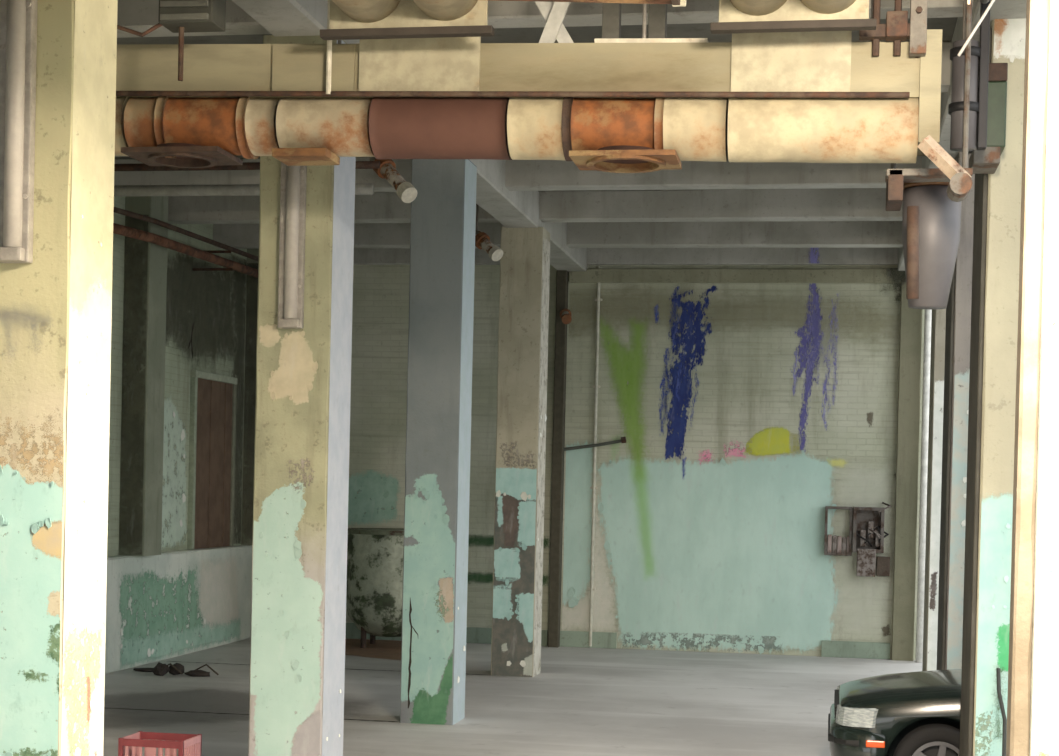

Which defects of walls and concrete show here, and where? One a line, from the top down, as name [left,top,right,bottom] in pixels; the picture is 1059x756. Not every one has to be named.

peeling [0,0,477,756]
spalling [491,236,550,677]
peeling [1035,562,1059,756]